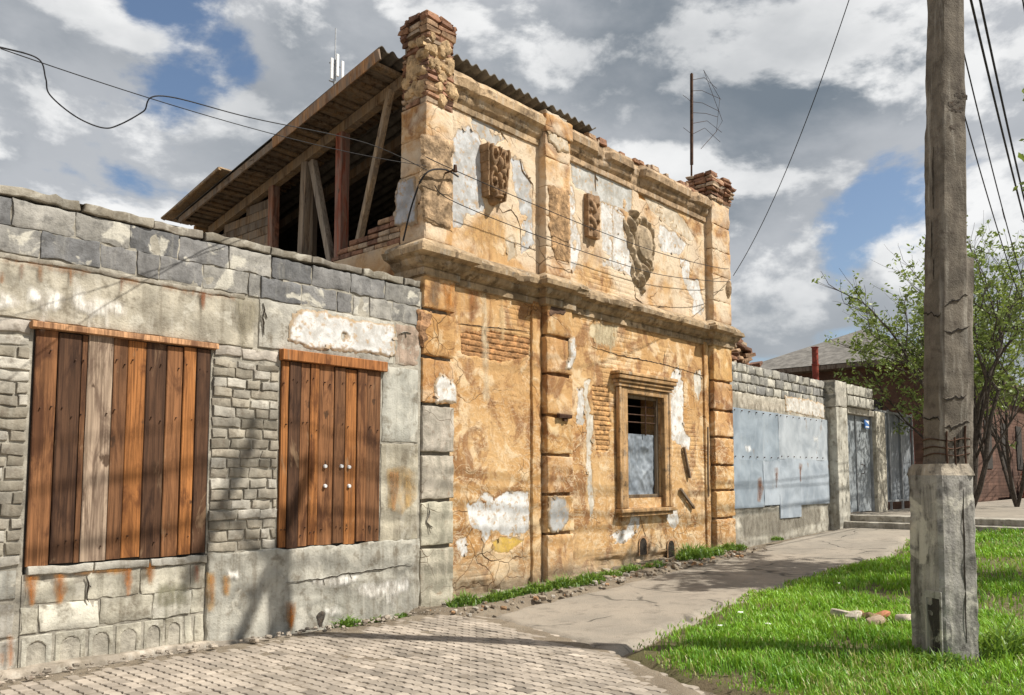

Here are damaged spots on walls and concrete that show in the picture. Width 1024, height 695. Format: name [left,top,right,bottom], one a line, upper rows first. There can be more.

spalling [393,117,504,229]
flaking render [505,155,535,261]
spalling [547,131,704,316]
flaking render [287,309,398,358]
crack [923,294,969,334]
flaking render [434,372,457,404]
flaking render [670,366,703,451]
corrosion [945,426,967,466]
flaking render [456,491,530,557]